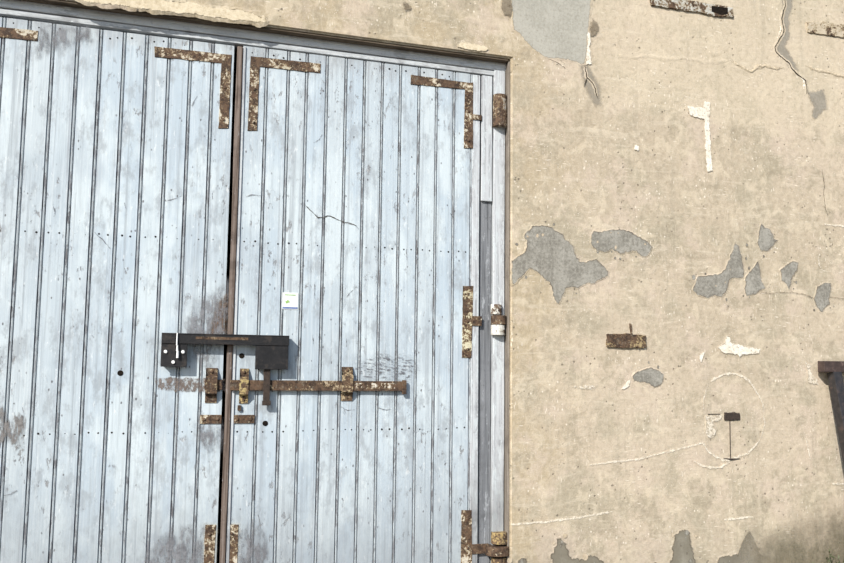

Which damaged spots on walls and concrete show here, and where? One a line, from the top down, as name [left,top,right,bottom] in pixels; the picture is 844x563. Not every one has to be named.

peeling [501,0,599,66]
crack [773,0,809,94]
crack [546,59,600,104]
flaking render [687,101,713,172]
peeling [510,221,654,305]
peeling [692,222,778,301]
peeling [813,282,834,314]
peeling [622,361,664,389]
peeling [549,534,604,563]
peeling [668,528,697,563]
peeling [716,534,749,563]